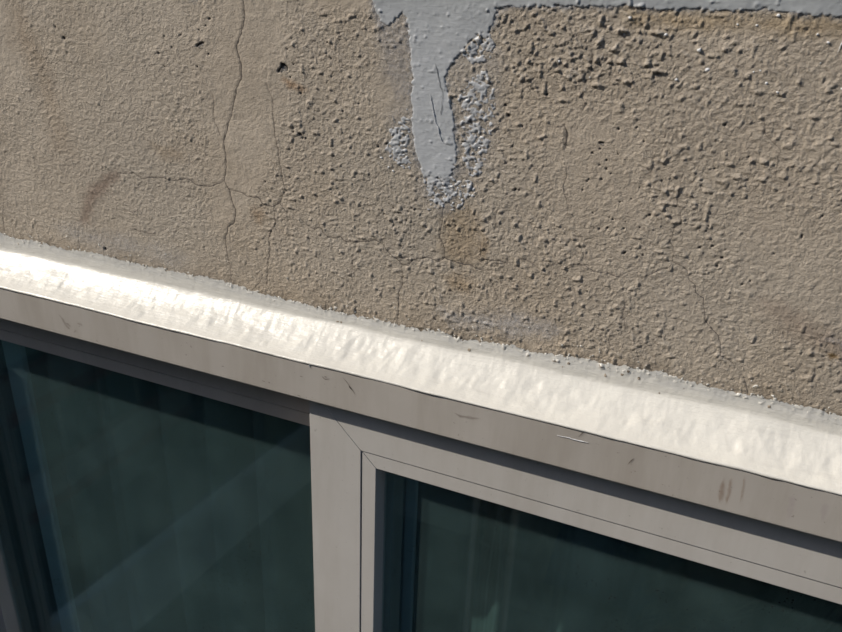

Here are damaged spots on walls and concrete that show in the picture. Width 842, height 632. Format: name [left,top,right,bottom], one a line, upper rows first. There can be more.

crack [120,2,286,287]
crack [302,197,622,313]
crack [642,173,748,394]